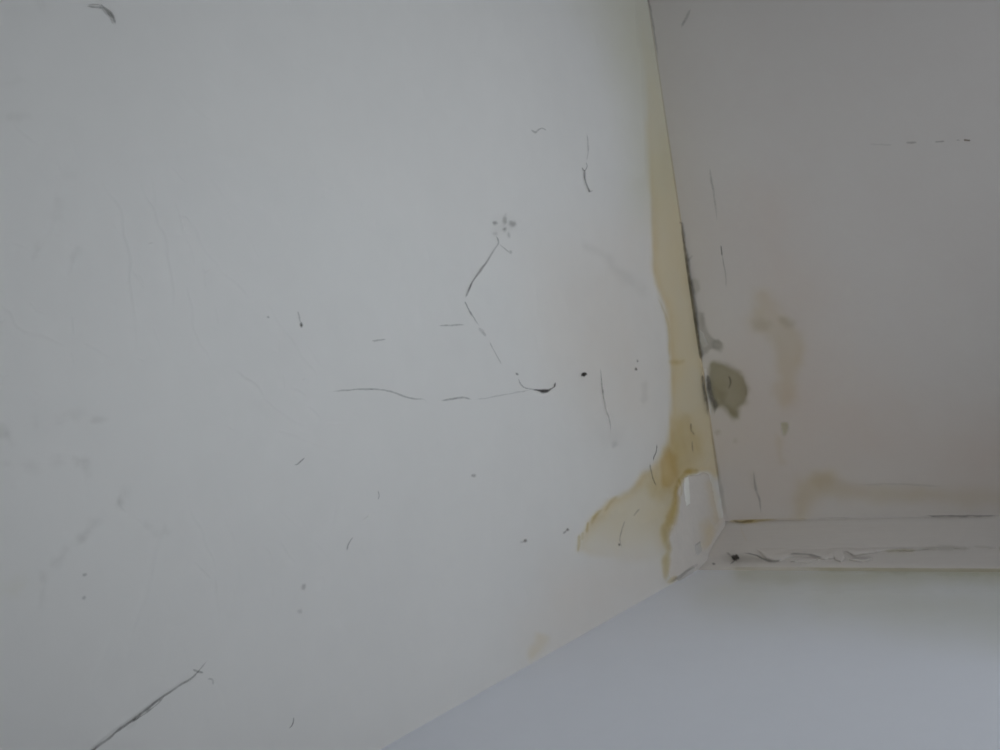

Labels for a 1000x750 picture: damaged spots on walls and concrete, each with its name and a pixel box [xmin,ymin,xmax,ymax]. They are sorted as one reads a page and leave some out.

peeling [667,472,719,581]